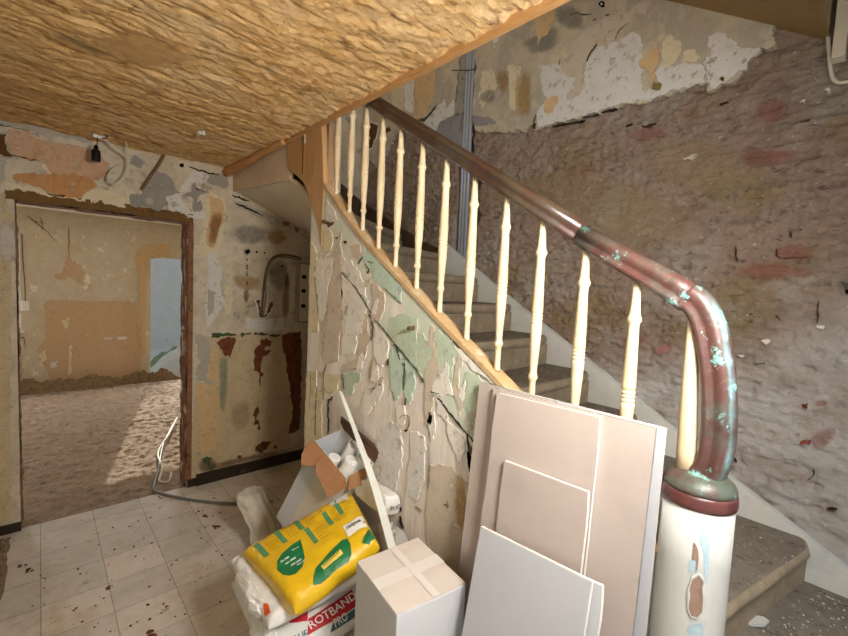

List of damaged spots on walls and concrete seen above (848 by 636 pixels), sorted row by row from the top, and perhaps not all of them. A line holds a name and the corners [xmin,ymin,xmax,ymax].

peeling [544,3,648,115]
peeling [639,34,701,91]
spalling [0,132,51,175]
flaking render [129,171,229,256]
peeling [0,192,23,526]
peeling [191,298,378,479]
crack [327,374,345,434]
crack [341,257,424,405]
peeling [396,361,427,502]
peeling [436,400,472,467]
crack [438,398,473,442]
peeling [685,542,707,619]